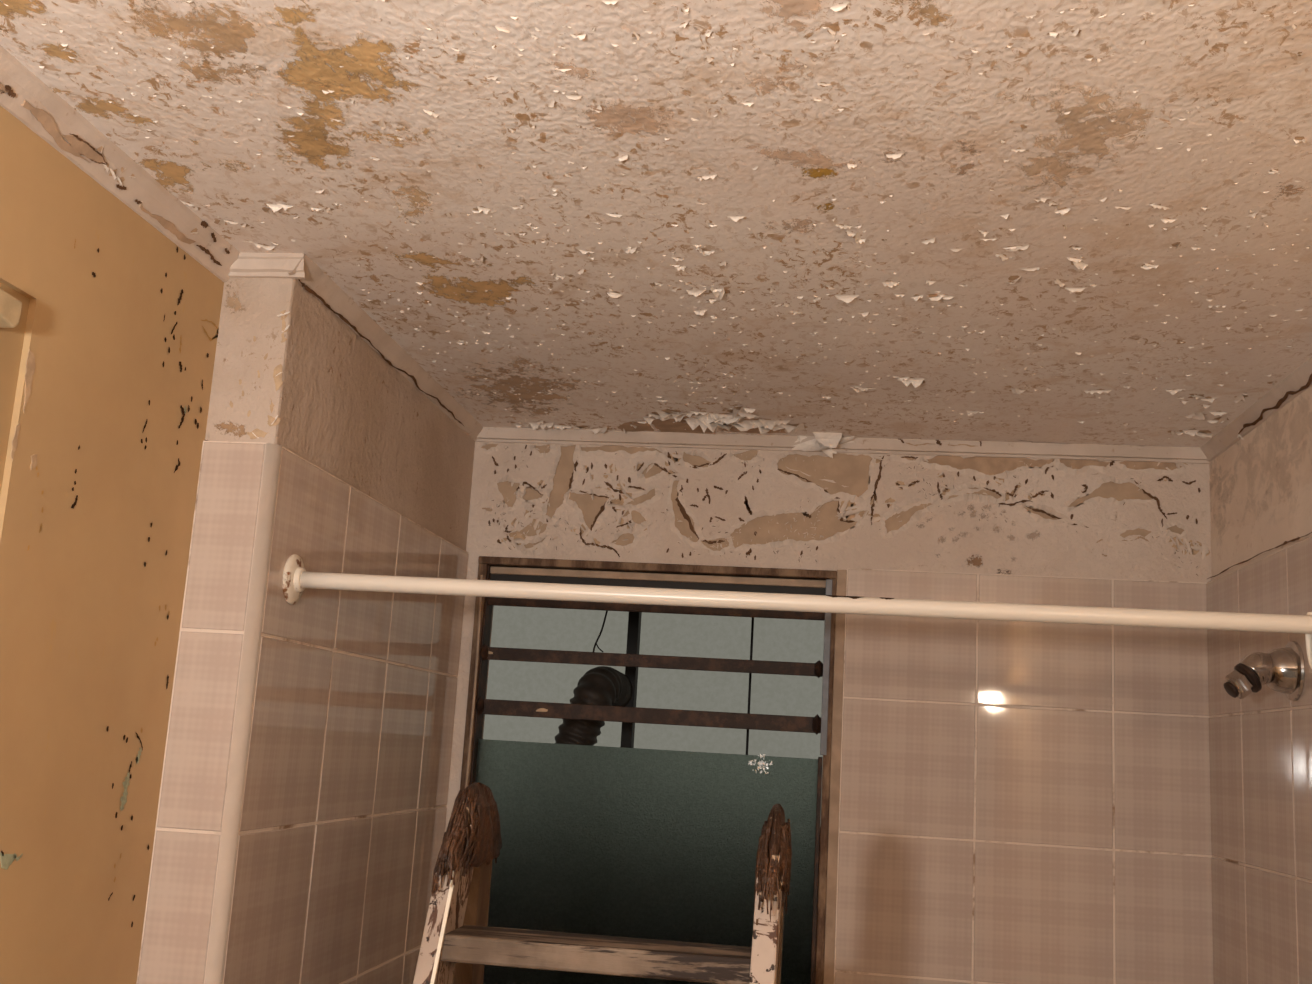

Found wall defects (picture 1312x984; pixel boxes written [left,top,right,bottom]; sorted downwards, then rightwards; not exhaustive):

peeling [0,76,222,266]
peeling [262,189,334,219]
peeling [977,213,1029,261]
peeling [1148,203,1202,250]
peeling [648,244,746,320]
peeling [803,278,968,317]
peeling [162,289,186,372]
crack [298,279,464,426]
peeling [851,376,925,393]
peeling [1165,384,1248,440]
crack [1238,374,1312,434]
flaking render [478,384,1210,560]